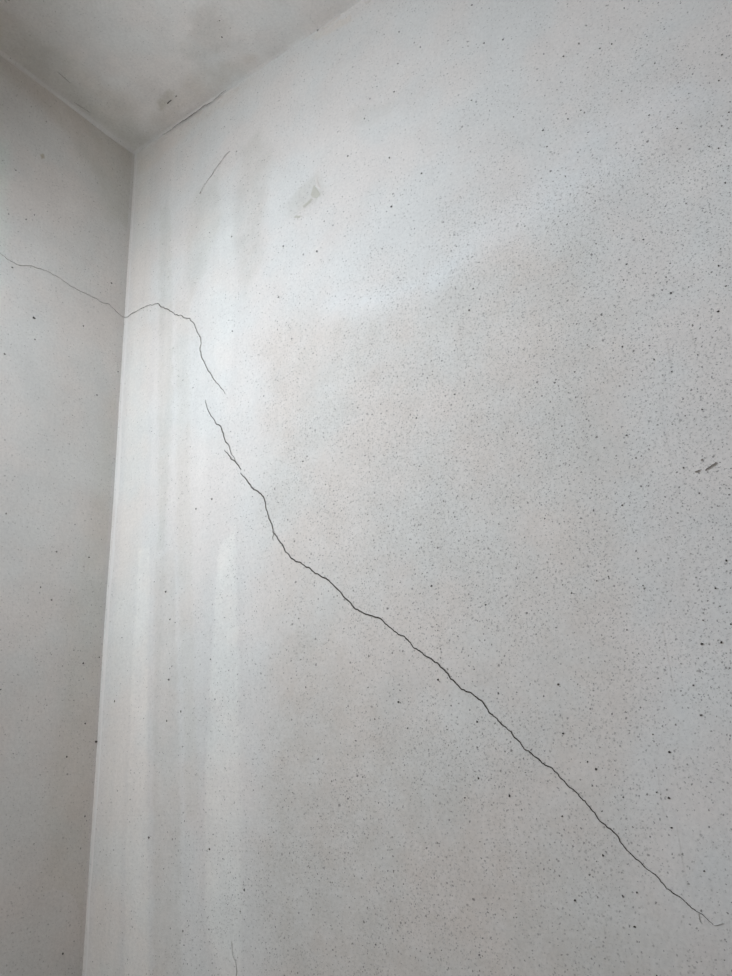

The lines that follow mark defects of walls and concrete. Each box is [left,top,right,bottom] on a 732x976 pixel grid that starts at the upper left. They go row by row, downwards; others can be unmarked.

crack [0,253,724,926]